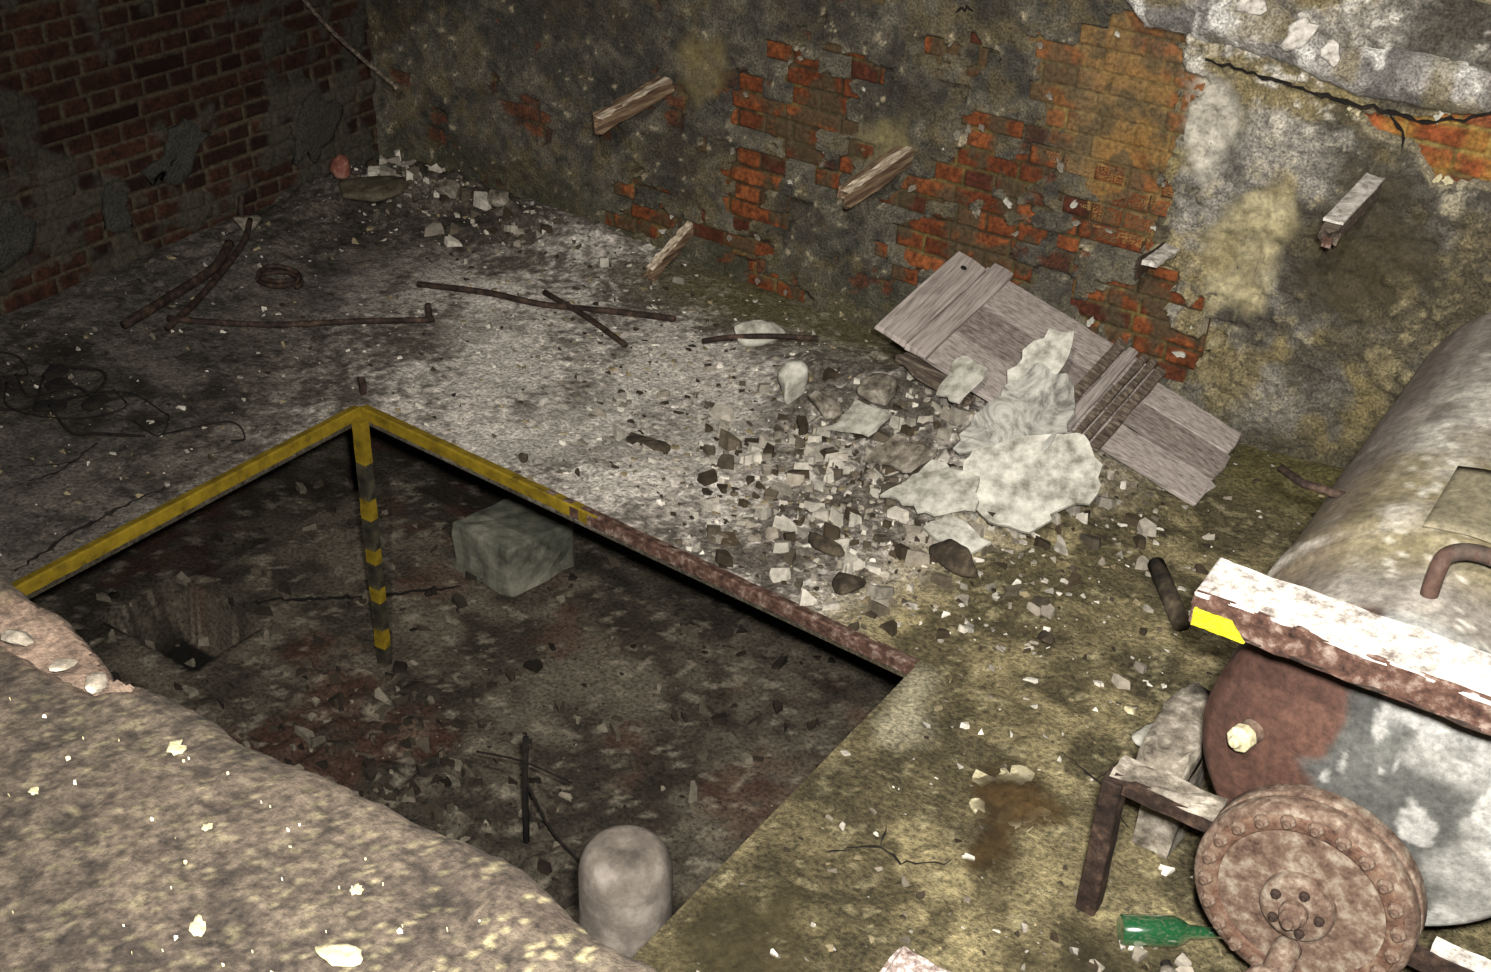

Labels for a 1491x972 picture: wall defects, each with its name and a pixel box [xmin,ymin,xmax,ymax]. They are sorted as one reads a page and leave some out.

spalling [605,40,886,302]
spalling [874,10,1211,383]
spalling [1346,106,1491,186]